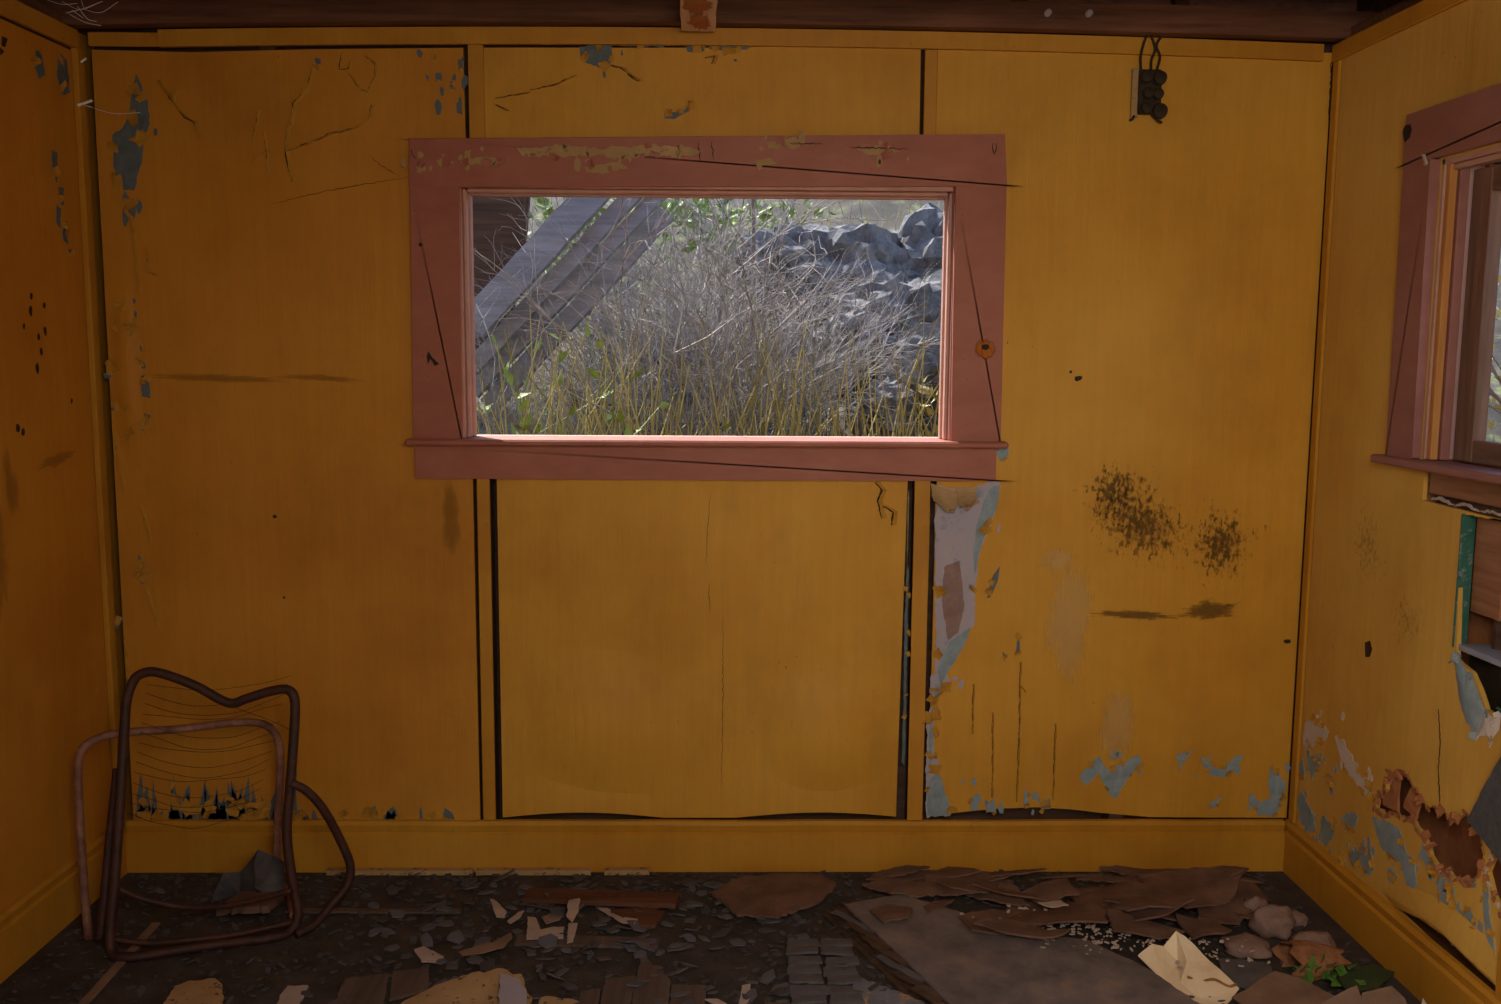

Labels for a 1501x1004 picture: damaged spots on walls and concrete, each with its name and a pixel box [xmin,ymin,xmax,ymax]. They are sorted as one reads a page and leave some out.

peeling [33,49,70,95]
peeling [106,75,157,227]
peeling [51,150,77,261]
leakage [1086,466,1180,560]
leakage [1187,510,1266,575]
leakage [1103,611,1168,619]
leakage [1189,602,1231,618]
peeling [901,481,1004,818]
peeling [1023,789,1052,815]
peeling [1080,748,1145,799]
peeling [1175,750,1245,778]
spalling [1247,709,1501,955]